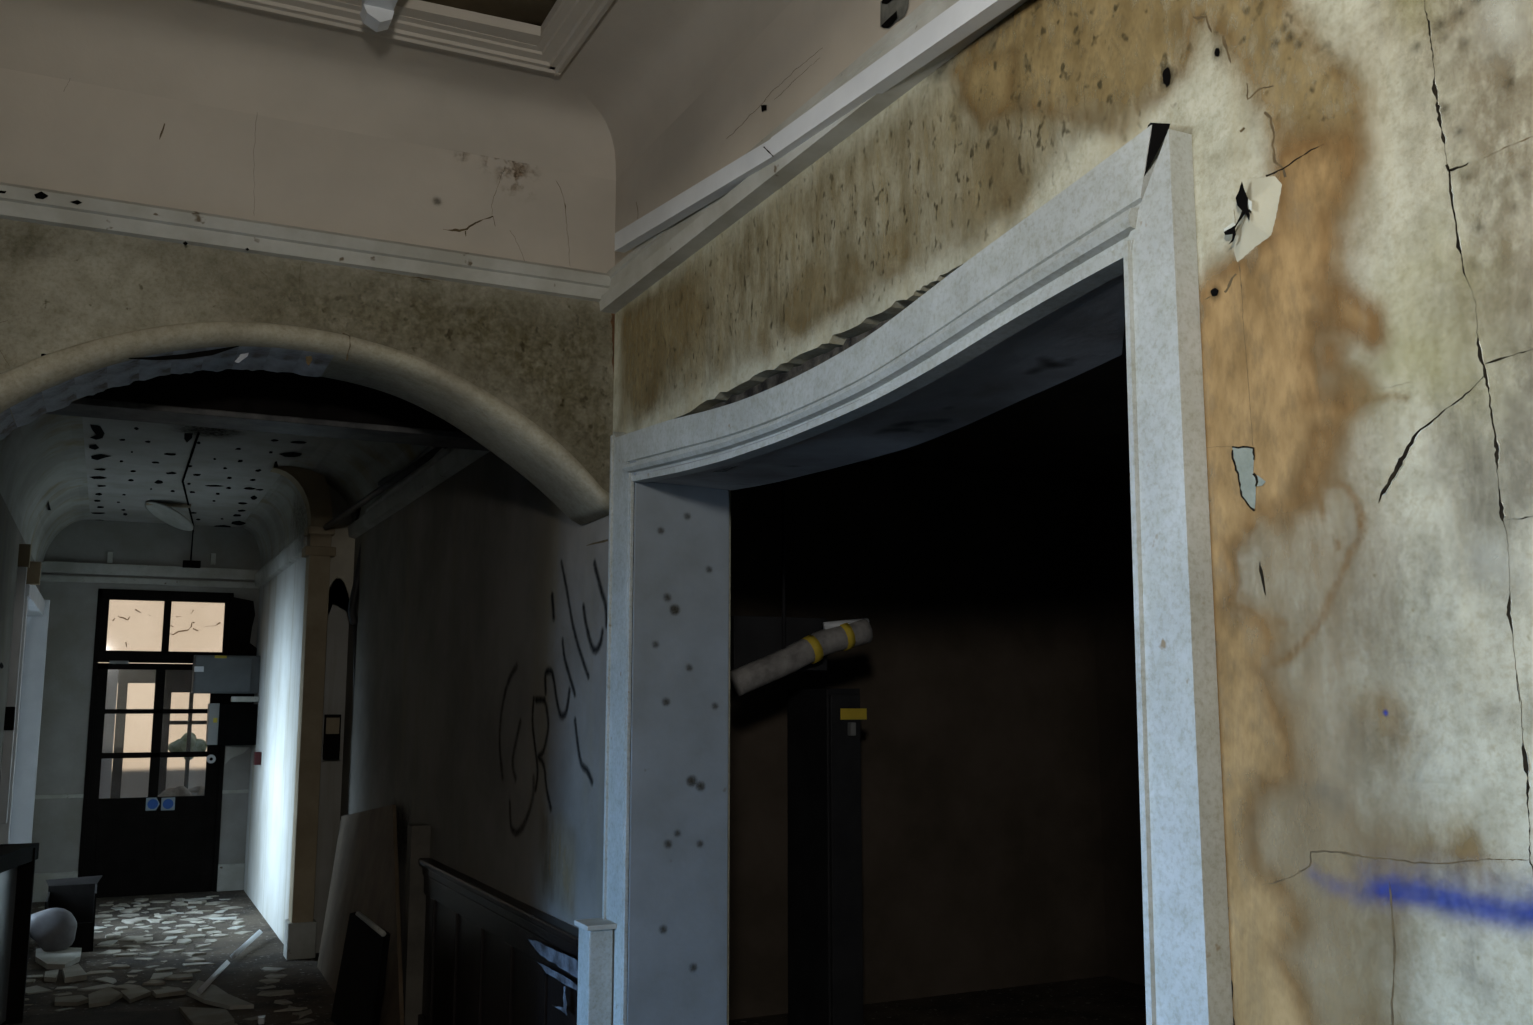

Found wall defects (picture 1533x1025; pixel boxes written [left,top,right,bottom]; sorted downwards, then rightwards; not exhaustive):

spalling [1224,182,1252,245]
spalling [708,318,892,410]
damp [622,0,1485,1025]
peeling [1231,446,1266,511]
crack [1263,0,1533,1025]